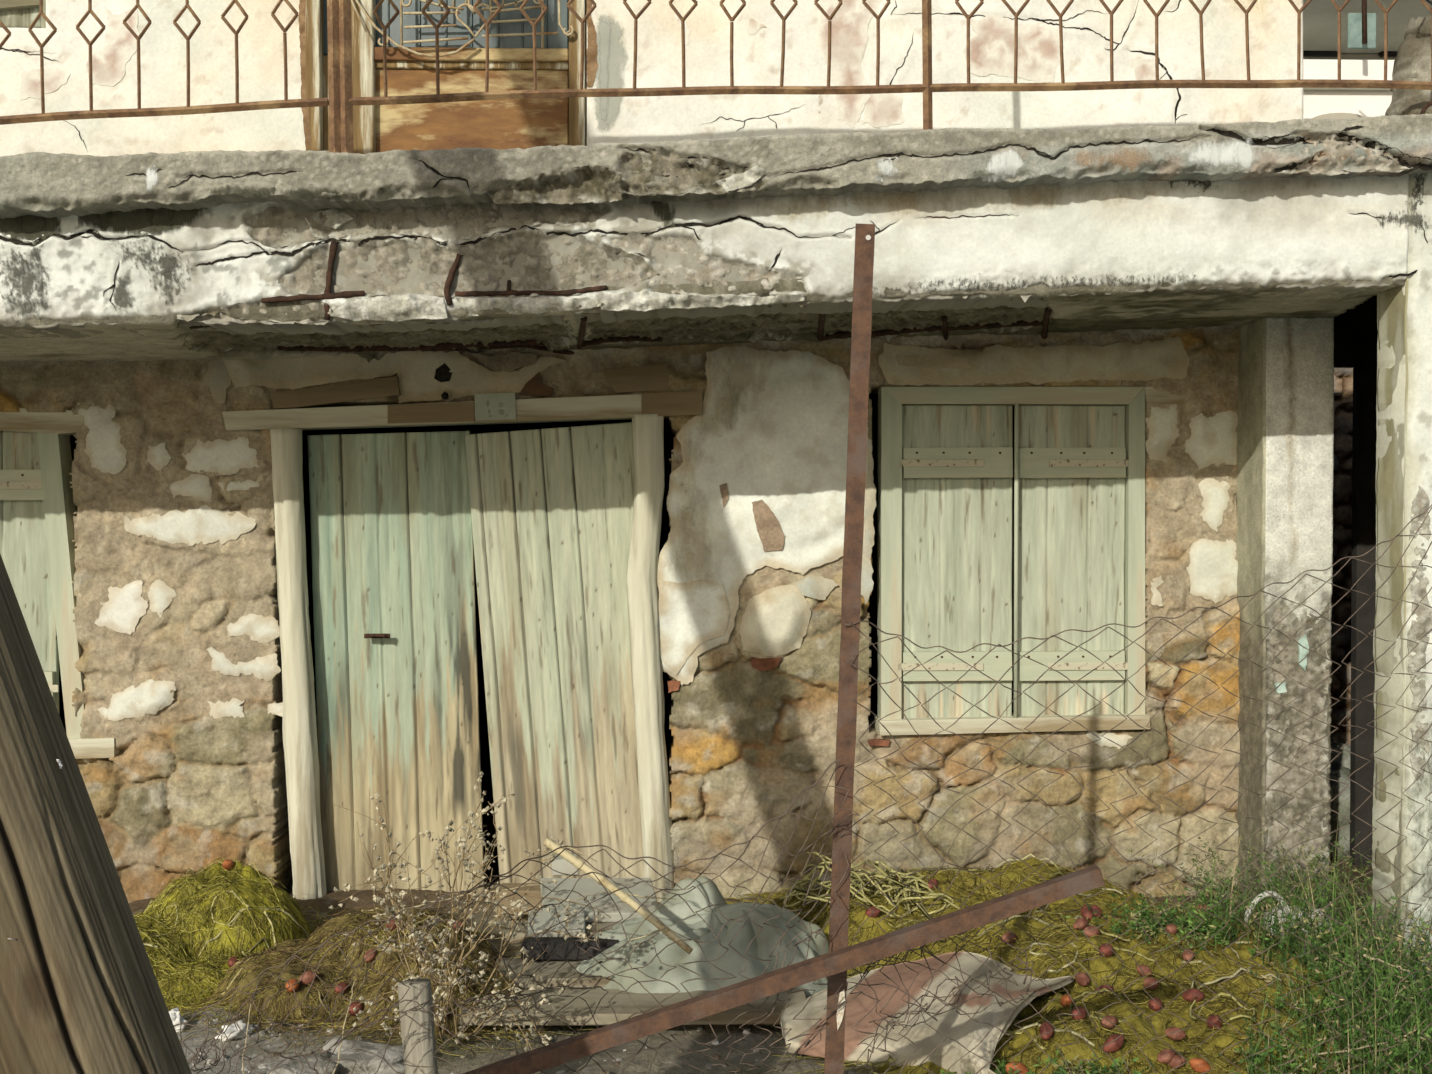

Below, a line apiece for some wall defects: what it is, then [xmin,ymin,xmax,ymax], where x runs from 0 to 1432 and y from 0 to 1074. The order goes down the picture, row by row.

crack [625,0,1432,182]
water stain [0,215,61,326]
water stain [146,165,158,190]
crack [126,169,303,188]
water stain [78,185,414,312]
crack [0,214,1018,308]
water stain [1377,173,1428,233]
crack [1387,219,1428,278]
peeling [177,146,852,685]
peeling [124,436,264,546]
peeling [861,428,876,605]
peeling [1144,404,1238,607]